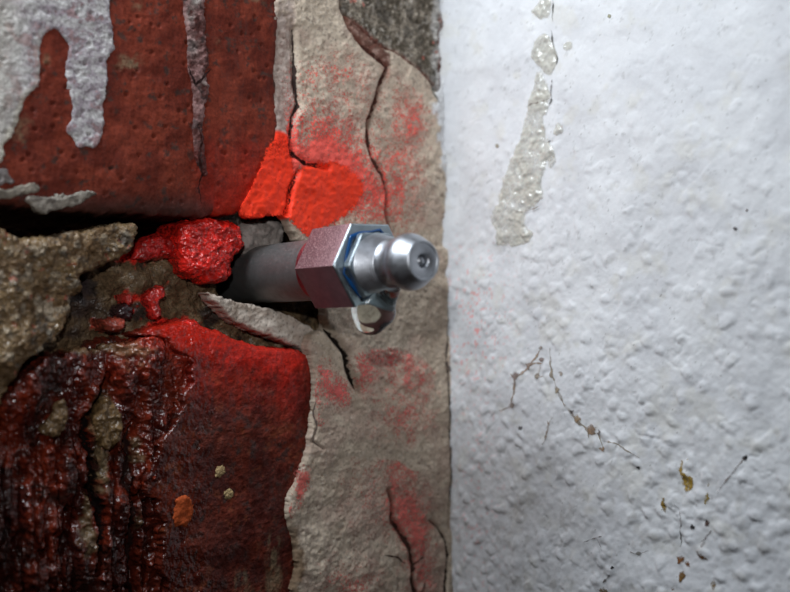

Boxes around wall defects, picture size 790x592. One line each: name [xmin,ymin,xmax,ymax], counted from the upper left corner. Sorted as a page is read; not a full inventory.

peeling [0,0,115,215]
crack [283,30,322,212]
crack [343,19,388,200]
crack [323,329,354,389]
crack [386,334,452,592]